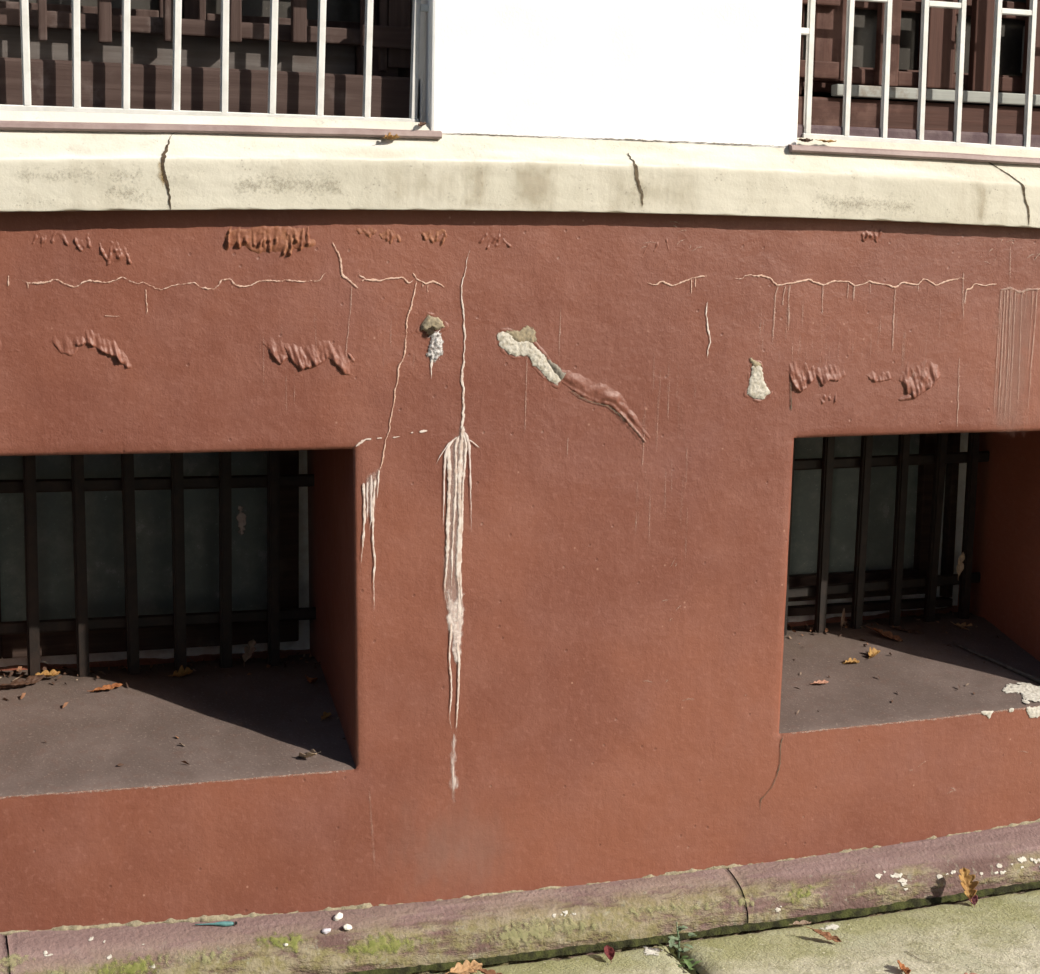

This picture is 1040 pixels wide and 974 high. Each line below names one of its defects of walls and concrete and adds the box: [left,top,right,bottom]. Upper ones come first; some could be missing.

crack [161,133,174,210]
crack [442,133,789,206]
crack [989,163,1030,222]
crack [8,243,470,469]
crack [735,274,995,345]
leakage [995,287,1039,405]
leakage [436,427,478,726]
peeling [956,682,1040,718]